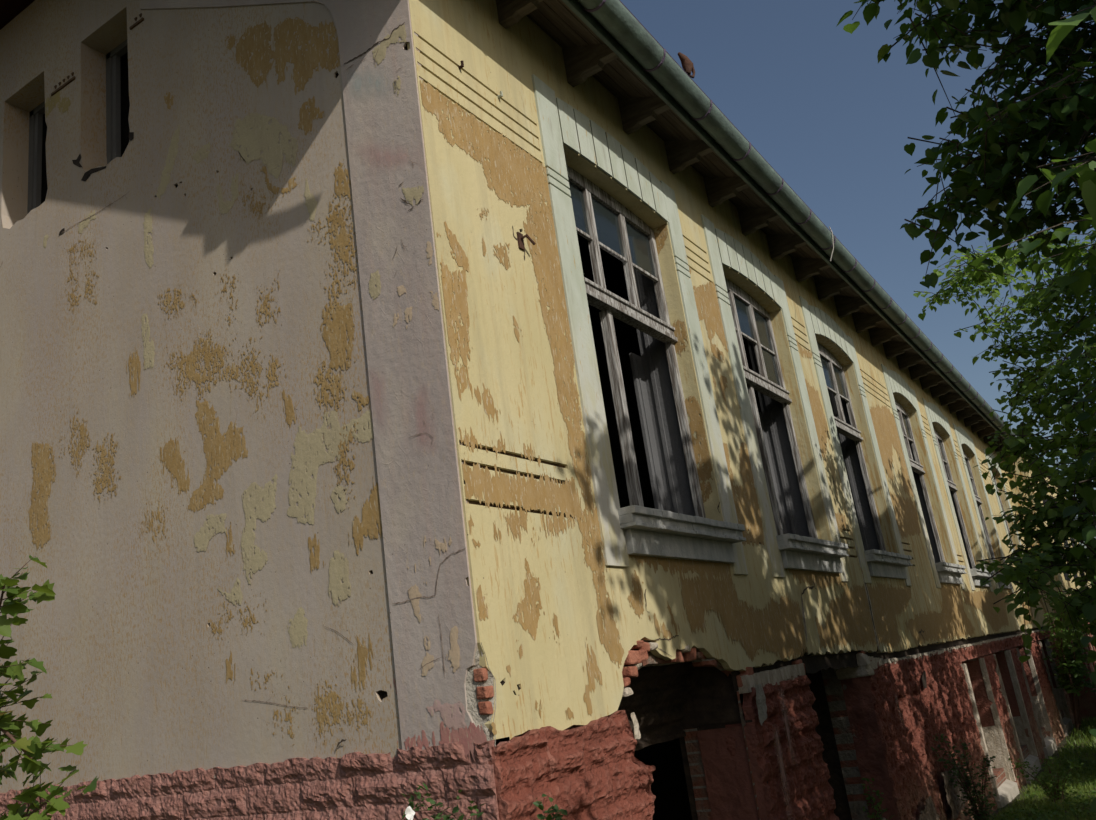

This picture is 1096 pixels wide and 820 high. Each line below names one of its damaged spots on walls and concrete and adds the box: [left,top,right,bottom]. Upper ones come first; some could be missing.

peeling [225,16,340,136]
crack [344,22,405,70]
peeling [29,399,122,549]
peeling [124,346,147,396]
peeling [135,159,382,745]
peeling [420,80,1042,746]
crack [393,548,466,677]